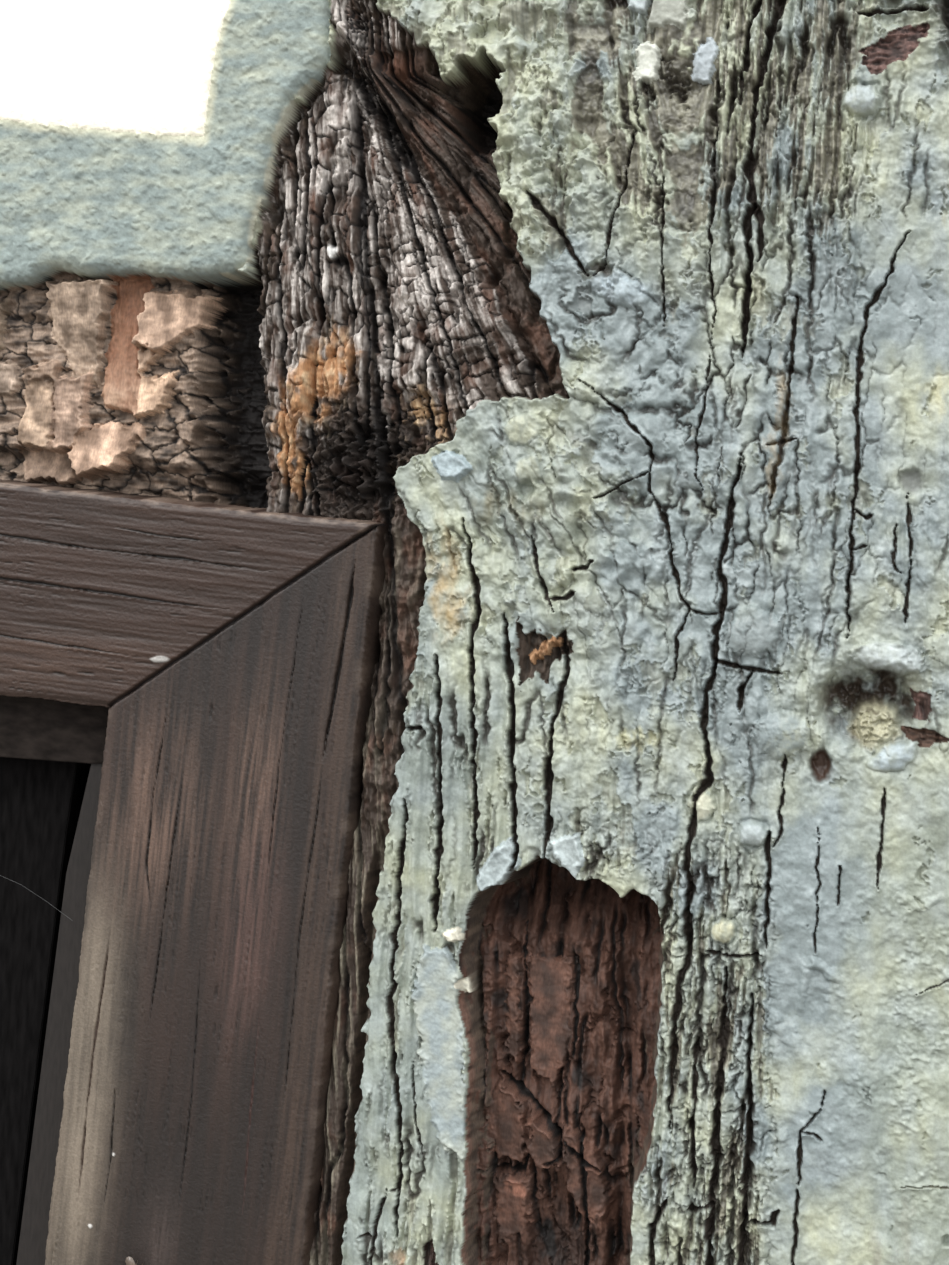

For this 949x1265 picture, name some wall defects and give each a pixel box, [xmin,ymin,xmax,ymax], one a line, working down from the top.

peeling [859,23,931,76]
crack [525,130,637,278]
peeling [0,275,230,487]
crack [845,231,914,641]
peeling [516,617,574,693]
crack [577,0,827,1265]
peeling [901,688,949,748]
crack [356,517,604,1265]
peeling [477,837,522,891]
crack [813,822,843,955]
crack [876,786,887,892]
peeling [503,951,577,1088]